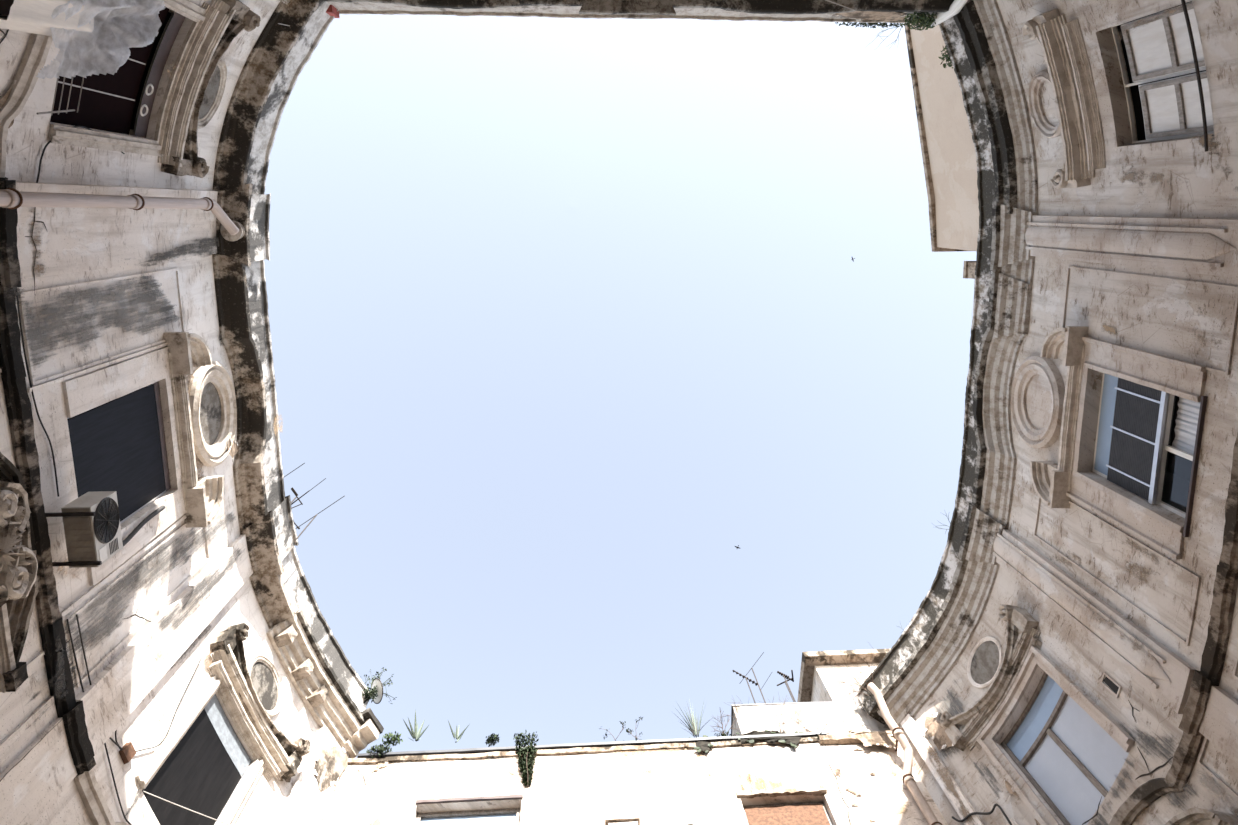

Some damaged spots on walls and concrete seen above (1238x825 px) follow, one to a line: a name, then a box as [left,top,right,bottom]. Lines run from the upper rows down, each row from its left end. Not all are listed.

leakage [25,237,220,365]
leakage [30,514,235,701]